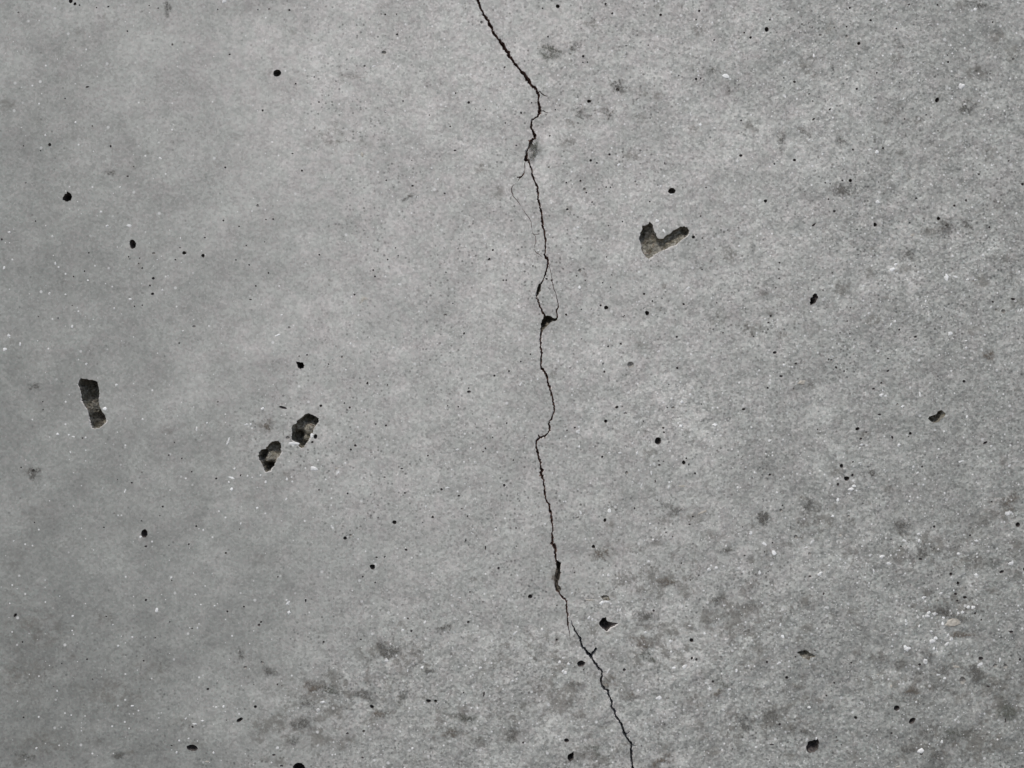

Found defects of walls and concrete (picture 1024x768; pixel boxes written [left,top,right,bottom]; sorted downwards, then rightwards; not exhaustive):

spalling [639,222,690,260]
spalling [78,378,108,429]
crack [476,0,636,768]
spalling [258,413,320,473]